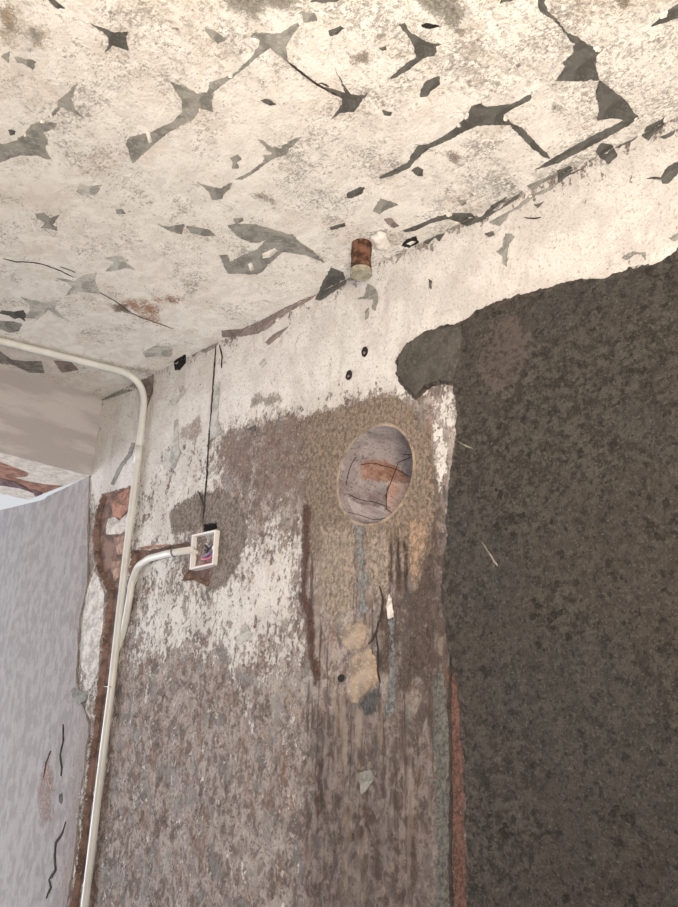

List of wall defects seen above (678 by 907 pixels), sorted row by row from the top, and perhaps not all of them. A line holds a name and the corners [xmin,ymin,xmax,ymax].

peeling [0,83,84,162]
peeling [126,0,339,163]
peeling [316,72,368,120]
peeling [373,0,678,267]
peeling [201,217,346,354]
spalling [0,462,61,497]
damp [169,488,247,591]
damp [220,393,454,907]
crack [43,724,64,778]
rust [442,667,468,907]
crack [46,821,66,899]